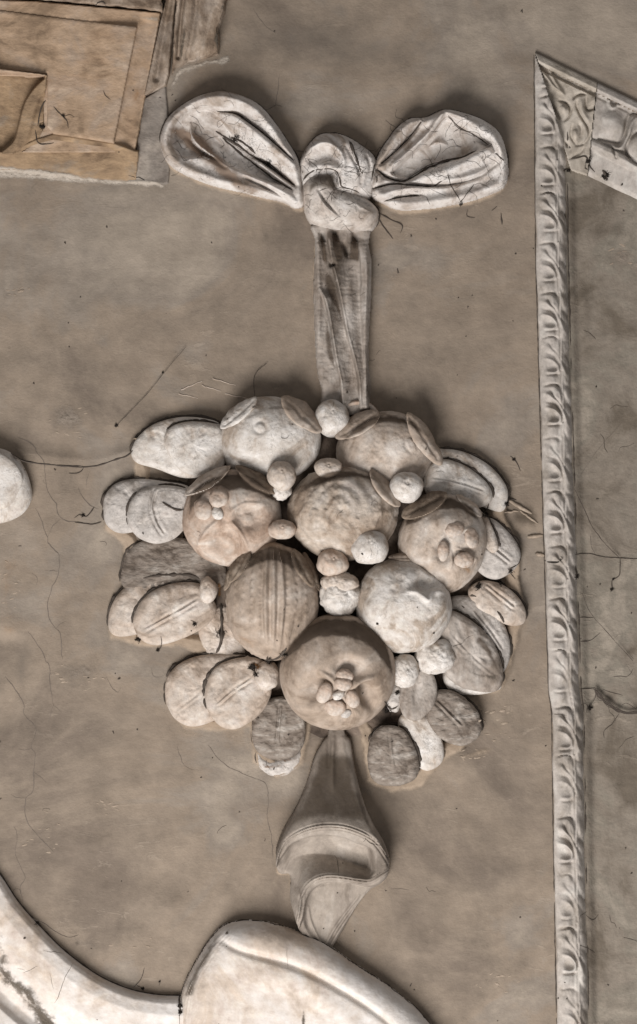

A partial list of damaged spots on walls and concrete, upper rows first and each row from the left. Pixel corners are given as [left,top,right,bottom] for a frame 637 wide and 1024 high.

crack [6,438,95,900]